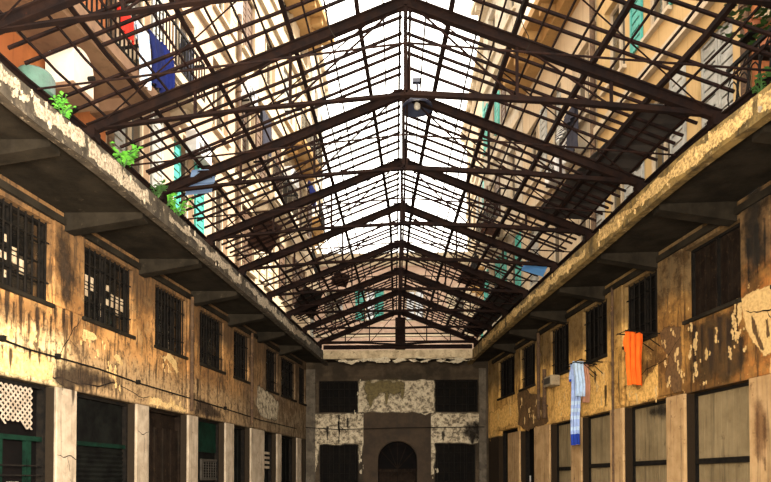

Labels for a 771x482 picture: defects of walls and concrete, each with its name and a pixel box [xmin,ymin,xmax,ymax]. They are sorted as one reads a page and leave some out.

spalling [0,63,150,205]
damp [5,235,75,337]
peeling [731,286,771,373]
damp [55,366,115,400]
peeling [315,379,479,478]
flaking render [490,377,571,438]